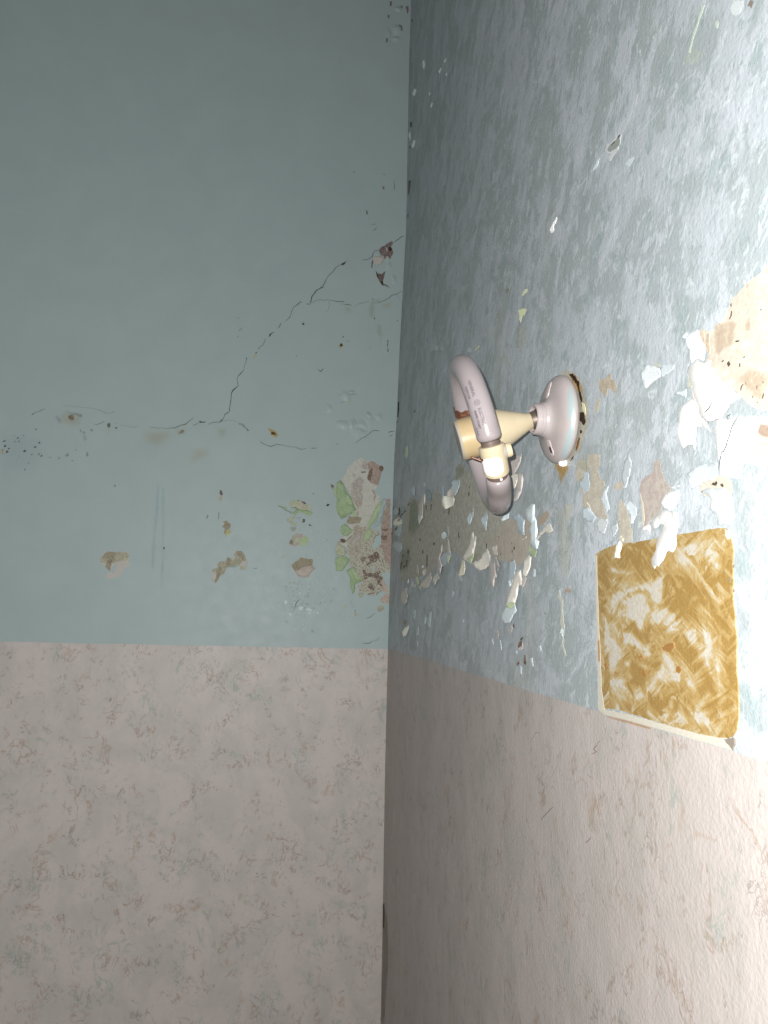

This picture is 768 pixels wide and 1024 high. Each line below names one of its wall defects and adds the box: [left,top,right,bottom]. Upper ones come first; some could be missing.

spalling [371,241,398,287]
crack [74,235,404,450]
spalling [575,266,768,569]
peeling [100,551,131,579]
peeling [211,551,257,583]
peeling [279,493,315,578]
peeling [326,454,553,674]